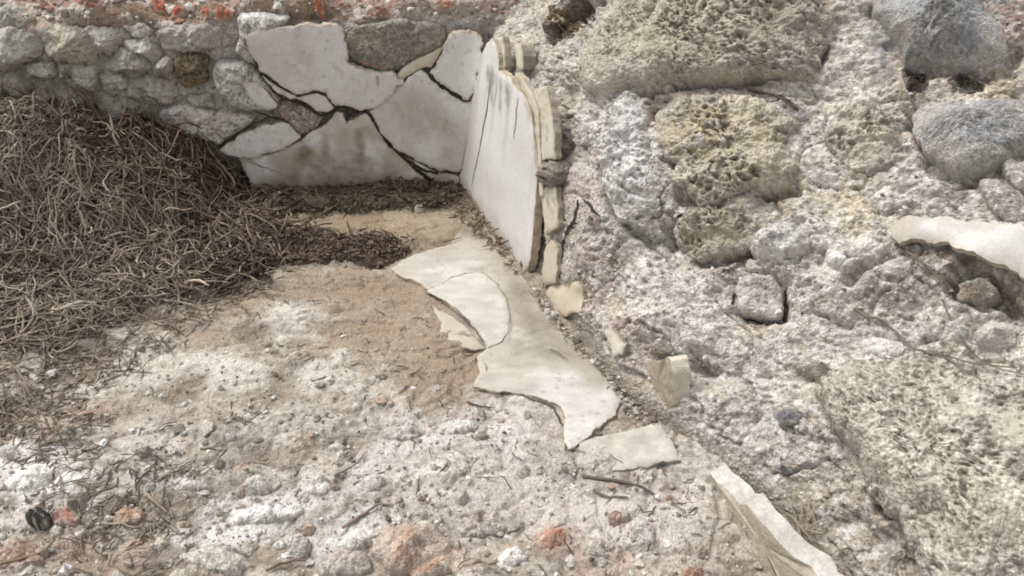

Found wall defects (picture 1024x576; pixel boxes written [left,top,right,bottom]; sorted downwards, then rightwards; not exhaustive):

crack [219,39,438,182]
crack [427,72,536,186]